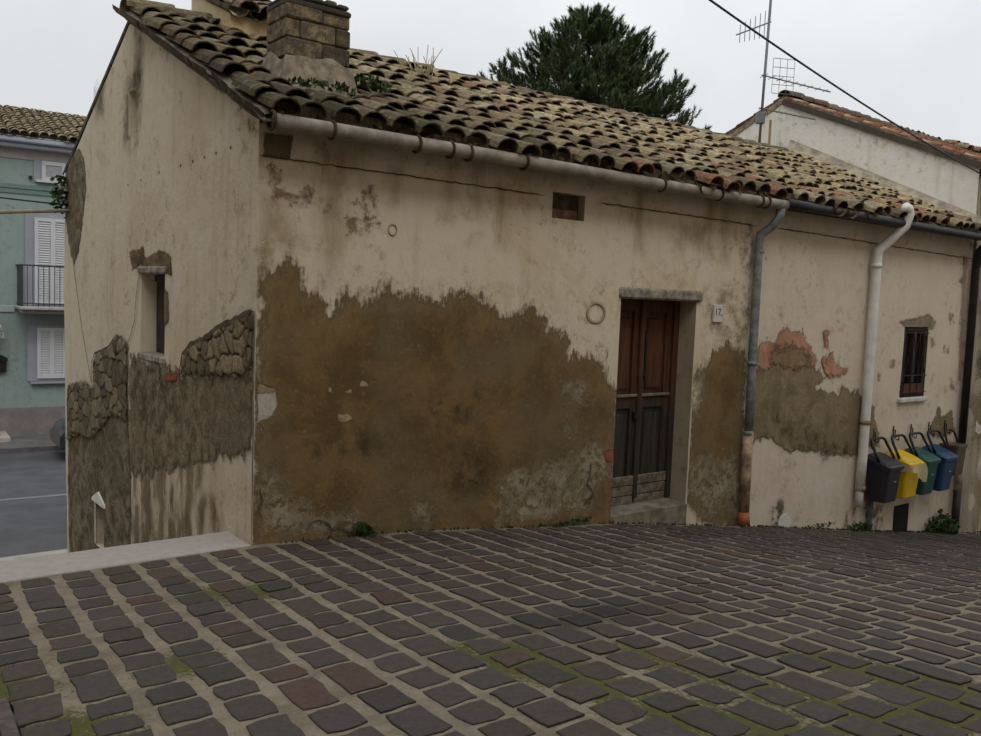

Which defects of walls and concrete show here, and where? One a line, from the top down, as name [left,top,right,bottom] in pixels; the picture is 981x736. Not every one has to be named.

peeling [68,255,617,553]
peeling [687,327,880,526]